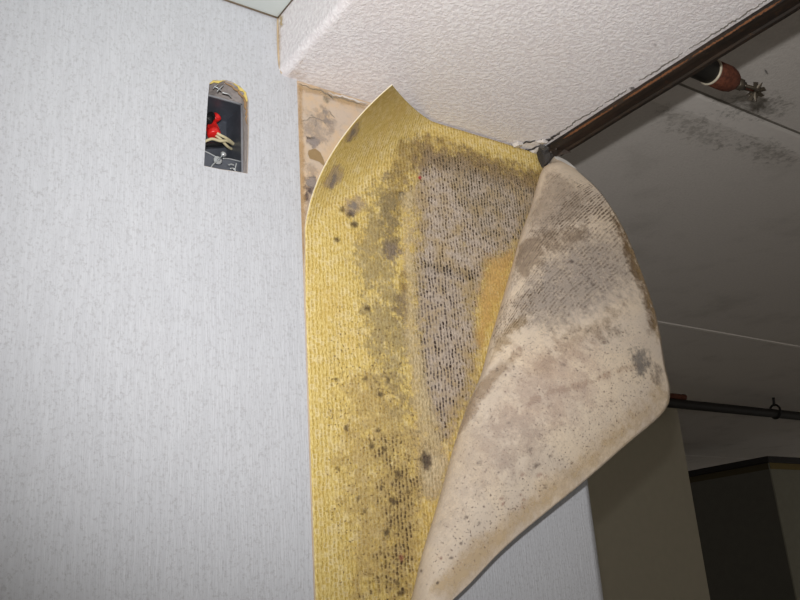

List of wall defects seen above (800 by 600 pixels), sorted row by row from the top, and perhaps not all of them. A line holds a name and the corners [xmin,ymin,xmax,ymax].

spalling [307,137,325,166]
spalling [512,133,560,167]
water stain [304,177,316,200]
water stain [329,147,661,600]